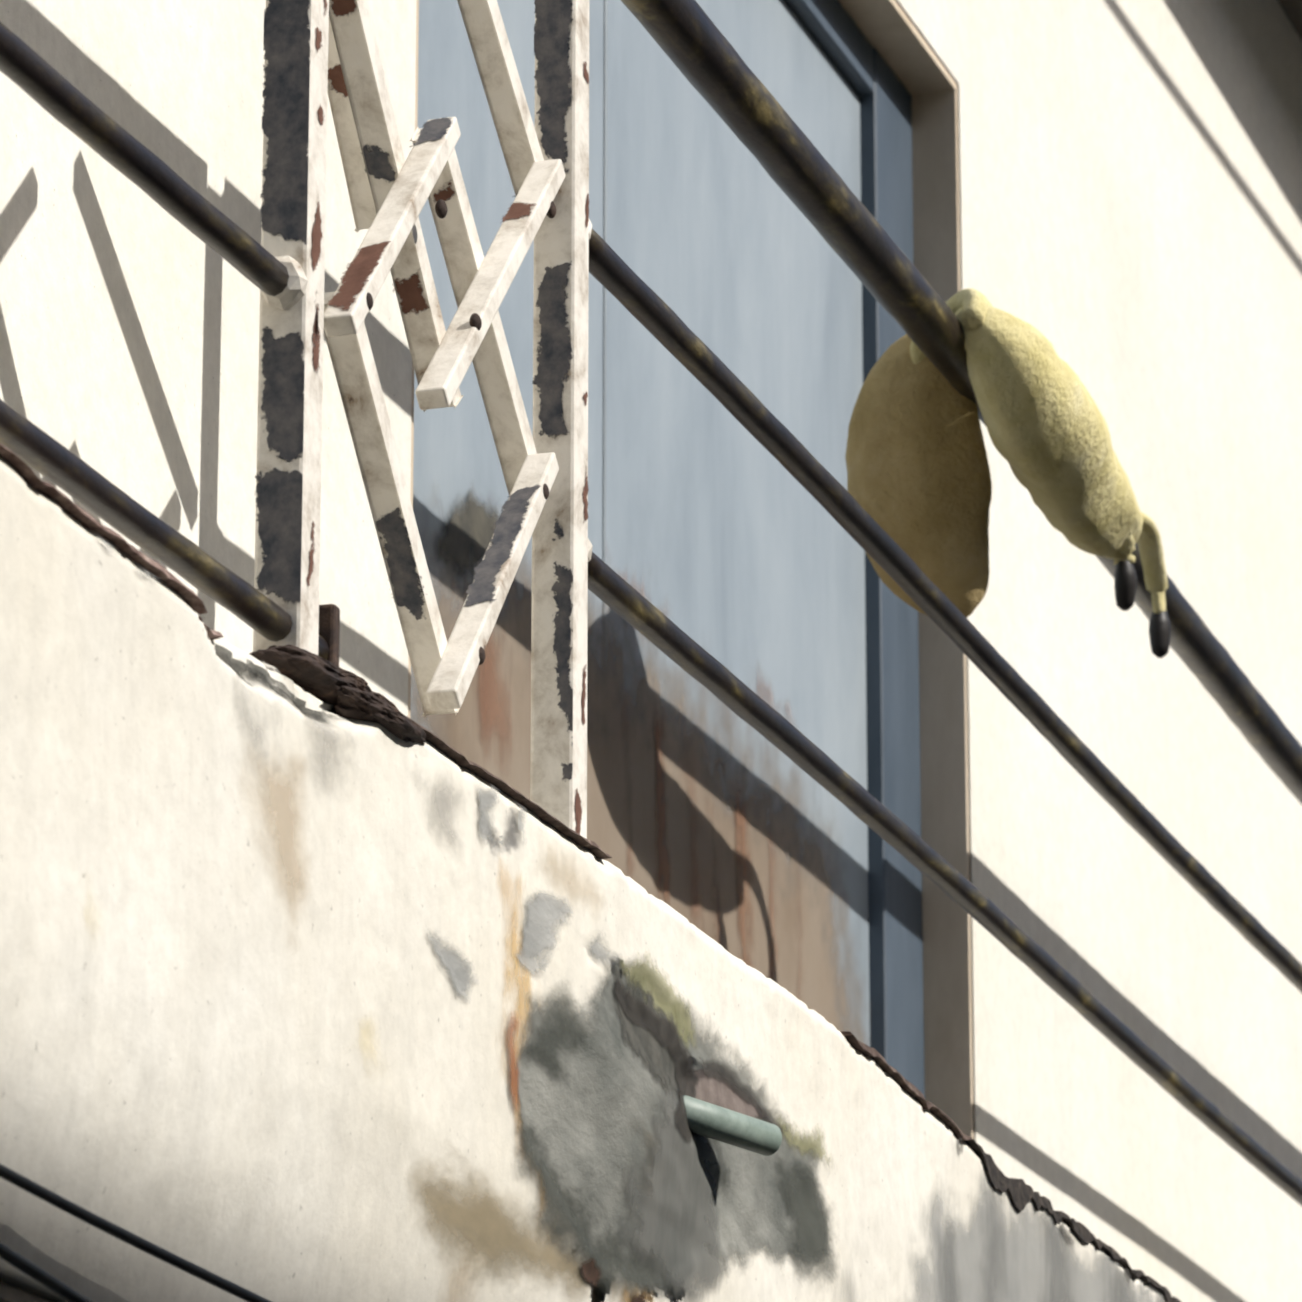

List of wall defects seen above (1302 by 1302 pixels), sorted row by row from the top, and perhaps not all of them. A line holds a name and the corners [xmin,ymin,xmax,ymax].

flaking render [479,789,503,845]
flaking render [430,936,473,998]
flaking render [518,892,572,973]
corrosion [509,928,530,1122]
spalling [516,940,834,1297]
leakage [917,1191,1165,1302]